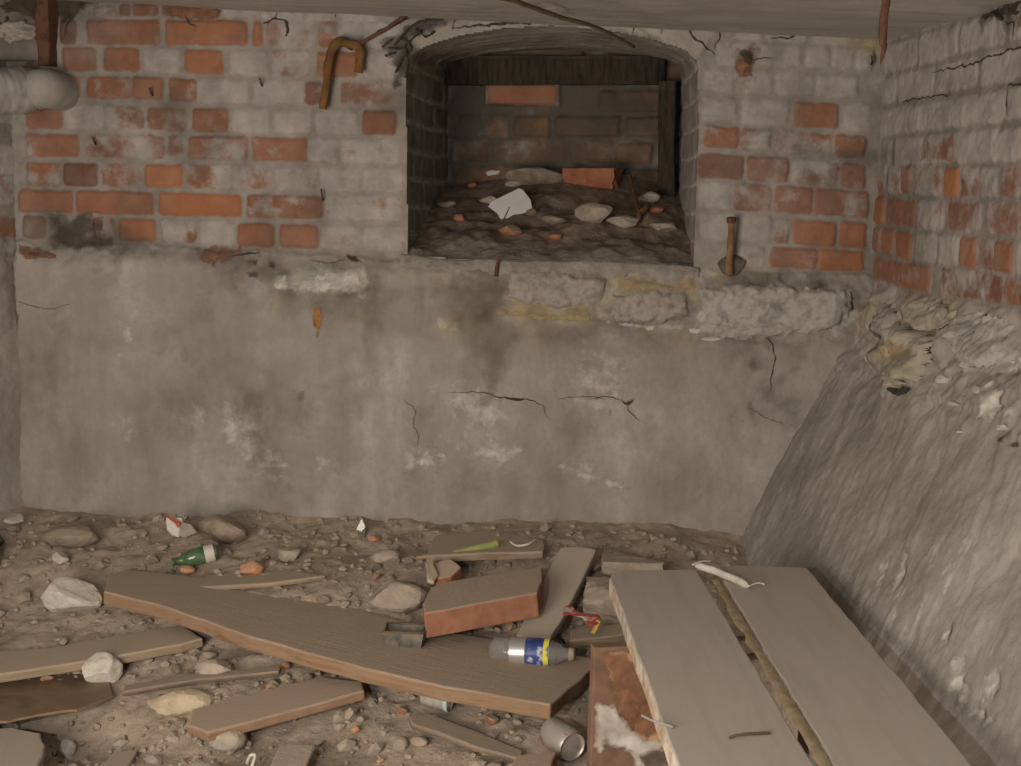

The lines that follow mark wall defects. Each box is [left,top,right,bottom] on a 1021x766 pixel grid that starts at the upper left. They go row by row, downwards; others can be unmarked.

crack [903,1,1021,103]
flaking render [505,269,854,341]
crack [451,391,603,420]
flaking render [864,296,1021,447]